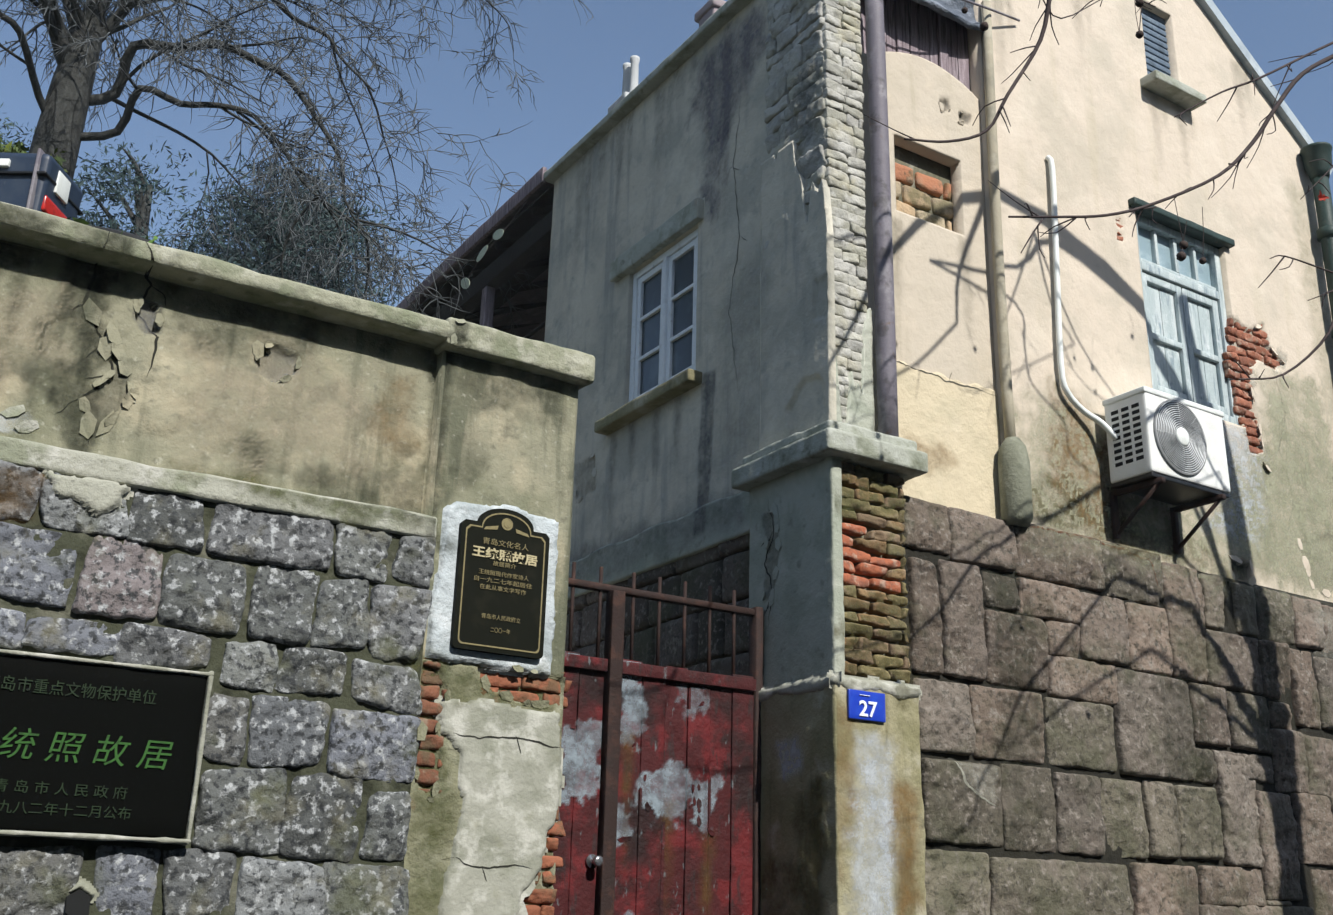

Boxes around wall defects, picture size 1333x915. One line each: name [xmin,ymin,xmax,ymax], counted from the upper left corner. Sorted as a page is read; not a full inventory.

crack [55,232,114,444]
peeling [78,298,140,439]
crack [138,242,166,376]
spalling [252,340,302,383]
crack [728,101,746,387]
spalling [1222,318,1286,485]
spalling [842,523,901,595]
spalling [414,657,451,803]
spalling [480,665,572,709]
spalling [517,720,601,915]
peeling [620,661,645,747]
peeling [638,760,673,816]